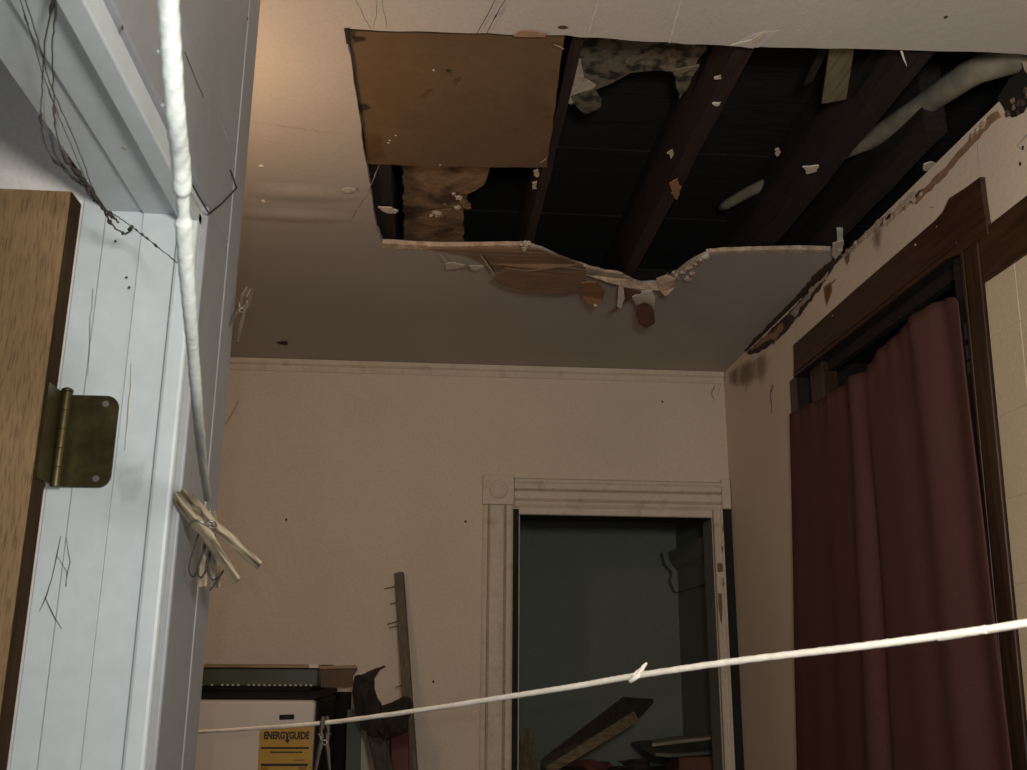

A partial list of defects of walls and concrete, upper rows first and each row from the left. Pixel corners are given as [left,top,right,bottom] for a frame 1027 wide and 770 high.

flaking render [841,59,1027,259]
spalling [381,239,830,328]
crack [39,536,71,629]